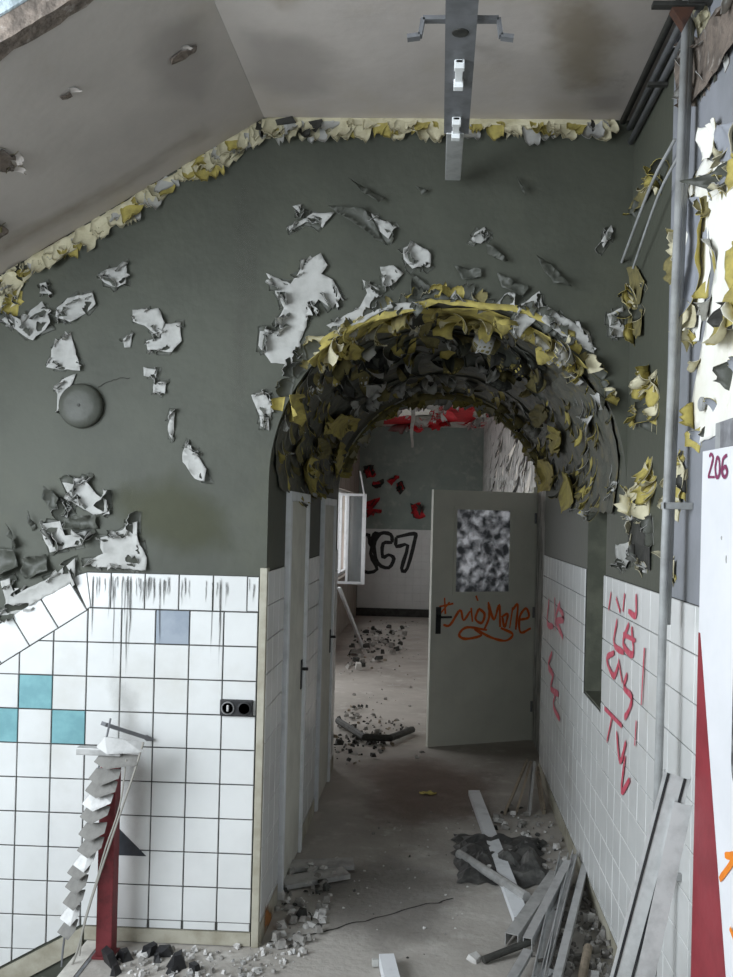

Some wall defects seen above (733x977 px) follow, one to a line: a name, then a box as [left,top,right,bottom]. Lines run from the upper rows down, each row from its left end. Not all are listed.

flaking render [672,0,733,108]
peeling [464,119,619,146]
peeling [622,158,670,218]
peeling [0,116,446,414]
peeling [663,229,673,285]
peeling [675,118,733,522]
peeling [165,408,214,484]
peeling [251,213,663,578]
peeling [0,473,148,623]